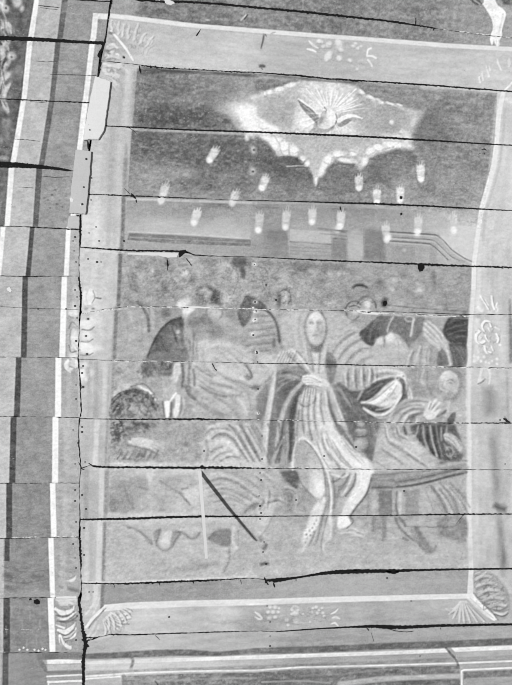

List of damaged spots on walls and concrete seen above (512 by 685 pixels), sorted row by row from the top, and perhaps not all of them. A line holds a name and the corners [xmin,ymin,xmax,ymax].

crack [136,0,436,31]
crack [0,0,112,77]
crack [139,65,512,92]
crack [107,126,512,154]
crack [0,161,72,178]
crack [30,215,202,270]
crack [258,257,512,269]
crack [79,462,260,470]
crack [82,513,512,524]
crack [264,568,512,587]
crack [78,537,242,685]
crack [275,623,512,641]